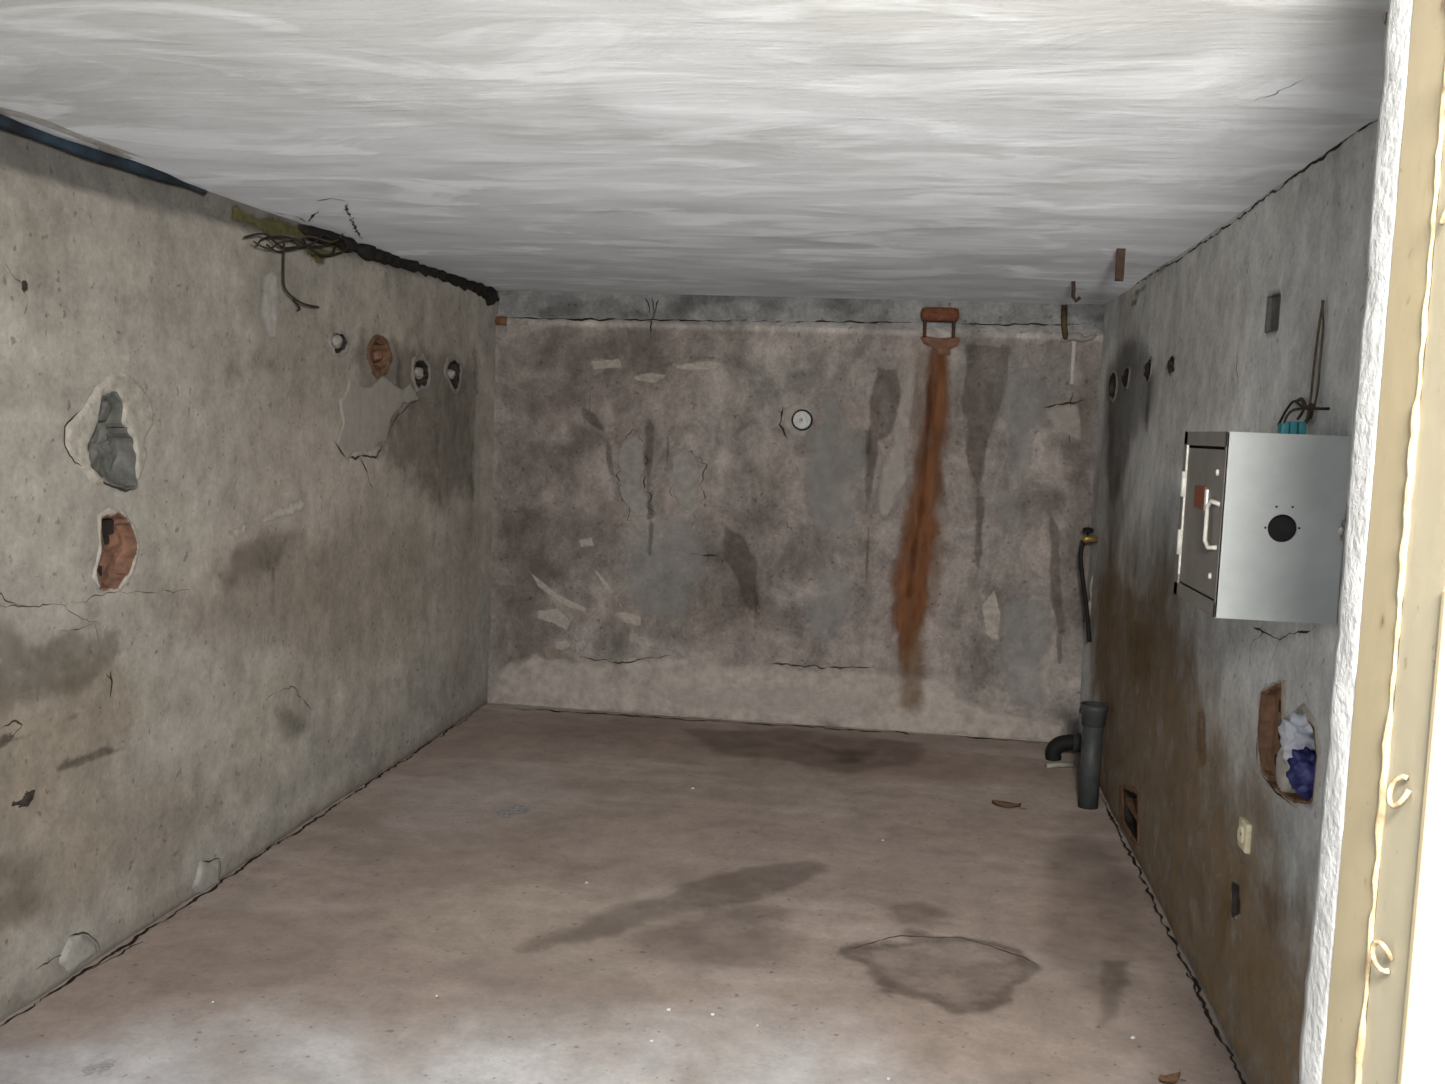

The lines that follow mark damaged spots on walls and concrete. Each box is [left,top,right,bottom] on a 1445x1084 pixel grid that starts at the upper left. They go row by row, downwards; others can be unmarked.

spalling [327,330,349,358]
spalling [64,373,154,492]
peeling [335,334,463,488]
spalling [92,508,140,593]
corrosion [893,348,947,661]
spalling [1256,680,1321,806]
damp [1093,554,1310,1084]